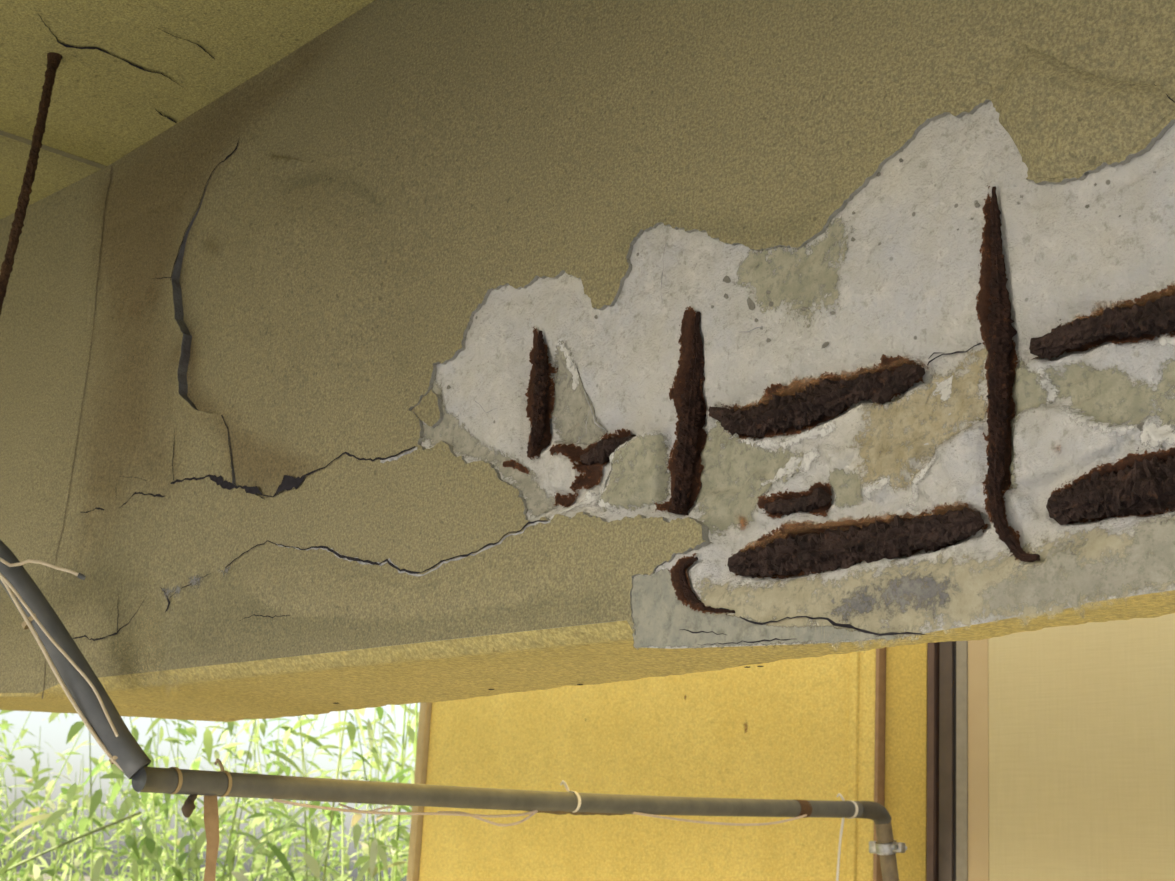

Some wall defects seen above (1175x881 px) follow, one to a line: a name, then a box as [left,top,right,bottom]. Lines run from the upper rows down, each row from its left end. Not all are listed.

crack [38,14,182,87]
crack [156,27,215,59]
crack [152,137,240,281]
crack [82,415,417,513]
corrosion [502,327,631,508]
corrosion [652,306,707,516]
spalling [411,101,1175,649]
corrosion [723,185,1175,579]
crack [73,520,551,641]
corrosion [668,553,727,614]